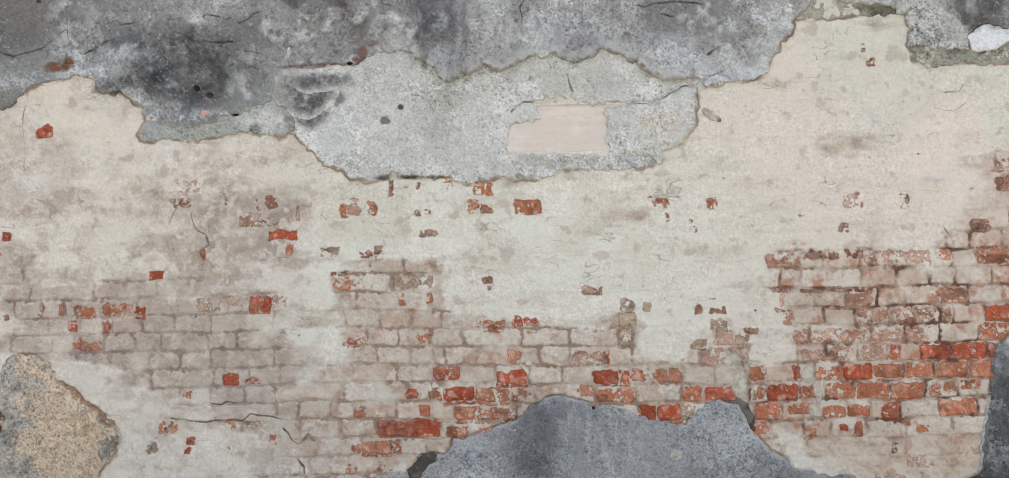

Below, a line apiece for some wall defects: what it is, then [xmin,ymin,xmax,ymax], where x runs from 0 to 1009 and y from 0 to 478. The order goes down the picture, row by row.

peeling [36,124,53,139]
spalling [138,46,707,215]
peeling [339,198,377,218]
peeling [239,195,300,255]
peeling [765,249,951,269]
peeling [149,271,164,281]
peeling [197,295,286,314]
peeling [59,302,146,352]
peeling [476,315,539,333]
peeling [571,285,1009,478]
peeling [352,349,530,472]
spalling [407,451,438,478]